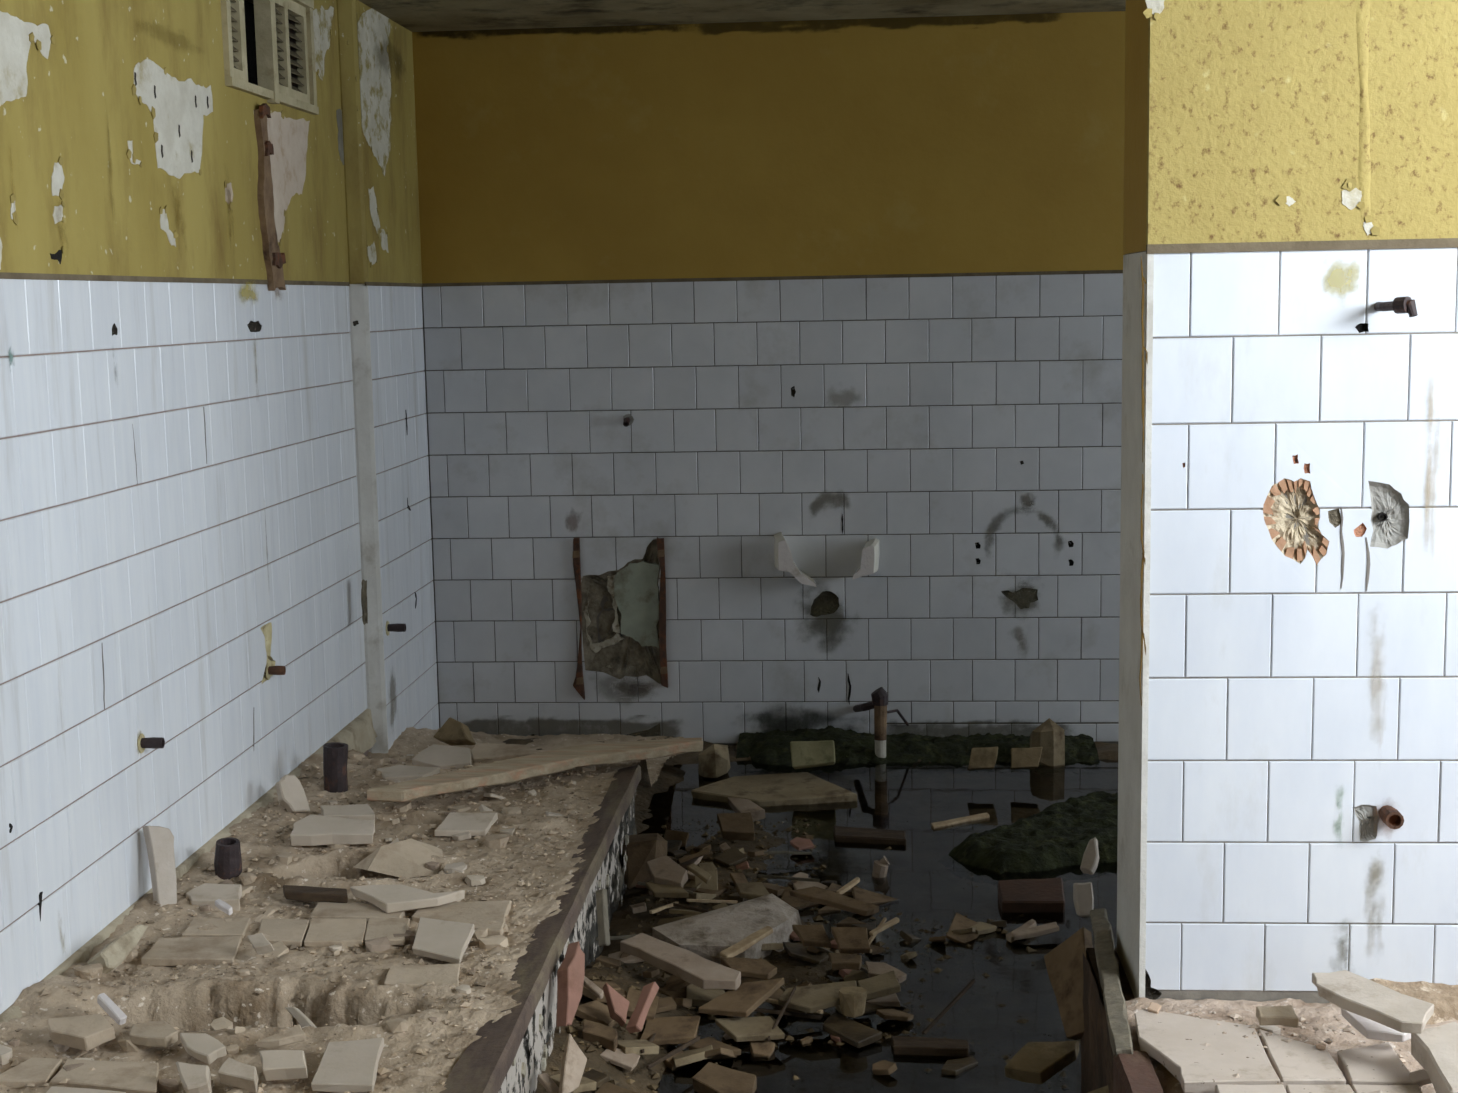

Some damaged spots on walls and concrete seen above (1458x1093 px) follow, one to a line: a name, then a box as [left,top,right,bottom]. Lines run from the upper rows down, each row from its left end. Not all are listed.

peeling [0,11,55,106]
peeling [10,193,19,225]
peeling [126,59,213,179]
peeling [267,110,310,246]
peeling [313,5,392,268]
spalling [1263,455,1409,566]
spalling [581,539,661,684]